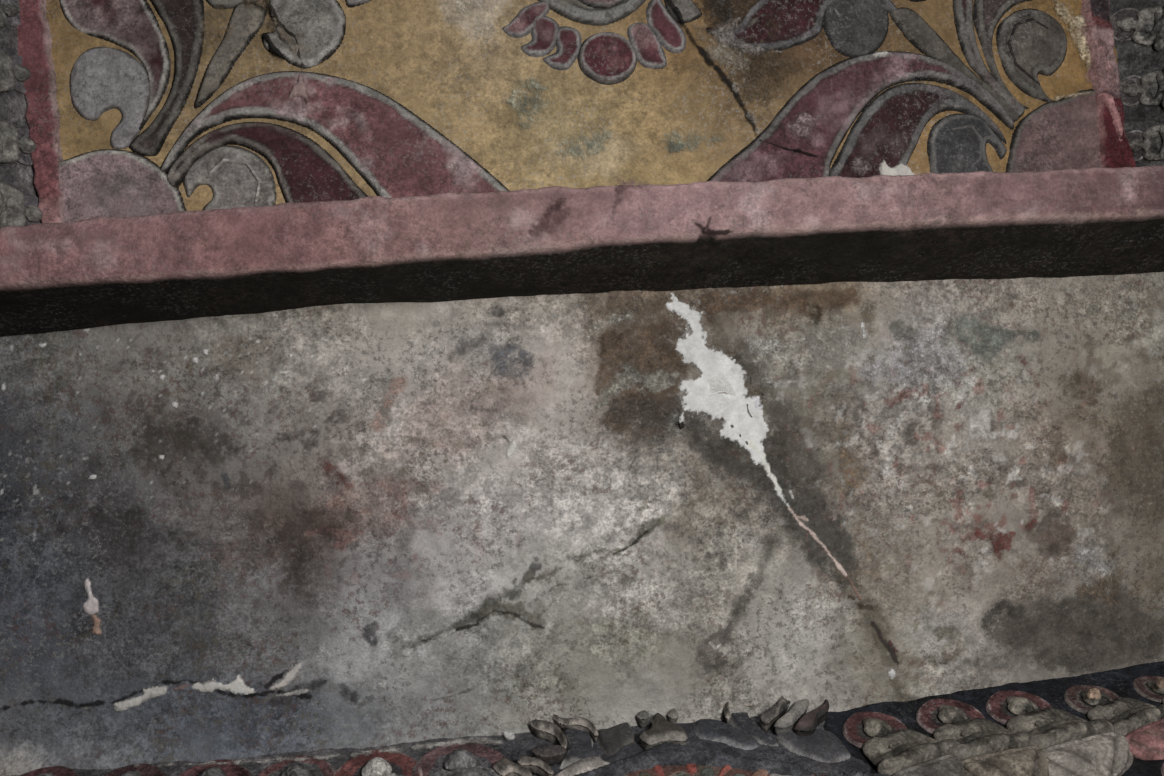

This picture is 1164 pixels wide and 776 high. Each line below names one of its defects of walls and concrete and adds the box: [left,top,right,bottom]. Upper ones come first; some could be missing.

crack [666,0,817,157]
peeling [787,113,822,138]
spalling [851,156,915,176]
spalling [666,293,789,506]
leakage [584,296,909,702]
spalling [83,579,101,634]
crack [406,501,698,648]
crack [788,490,899,679]
crack [1,670,358,710]
spalling [114,675,255,711]
spalling [270,663,309,696]